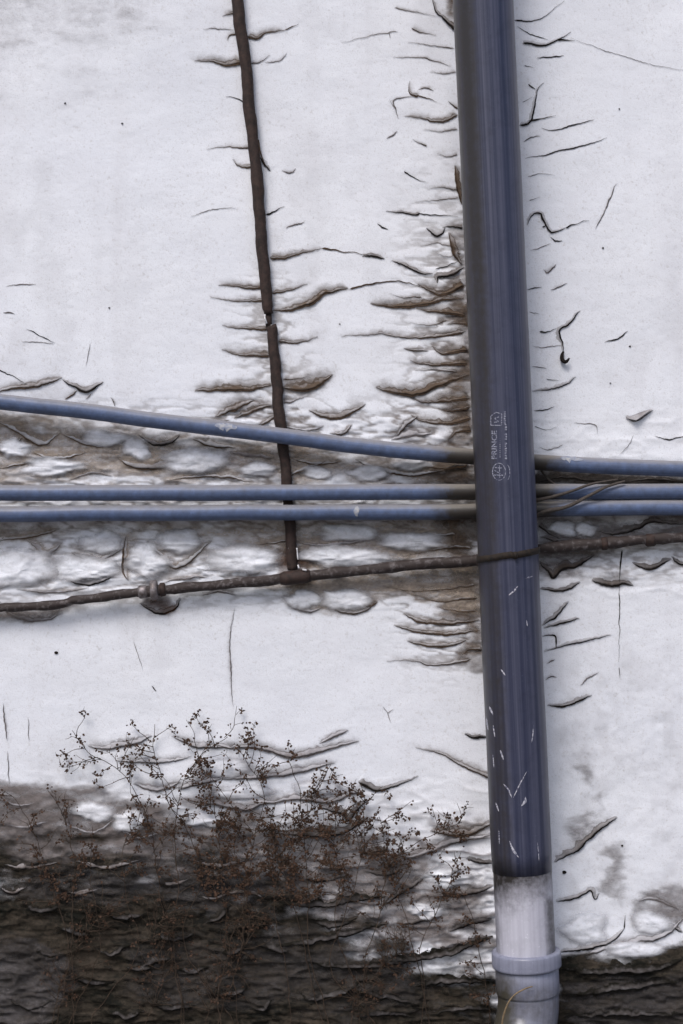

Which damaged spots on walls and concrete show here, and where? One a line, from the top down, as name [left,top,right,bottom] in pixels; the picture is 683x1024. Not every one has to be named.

crack [515,1,673,69]
crack [525,120,605,201]
peeling [195,165,471,441]
crack [528,238,567,314]
peeling [0,528,129,594]
peeling [384,581,481,666]
peeling [540,551,683,628]
peeling [88,729,417,838]
leakage [0,782,497,1024]
leakage [637,890,683,919]
peeling [298,917,493,1002]
leakage [557,945,683,1024]